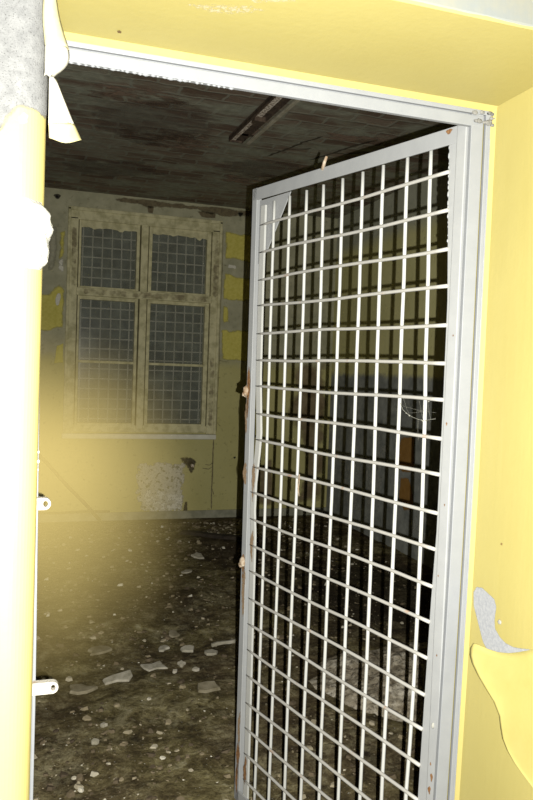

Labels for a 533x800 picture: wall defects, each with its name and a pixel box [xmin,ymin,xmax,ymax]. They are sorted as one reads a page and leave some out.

spalling [0,0,81,143]
peeling [41,286,64,331]
peeling [213,232,251,361]
peeling [136,457,196,511]
peeling [470,587,533,787]